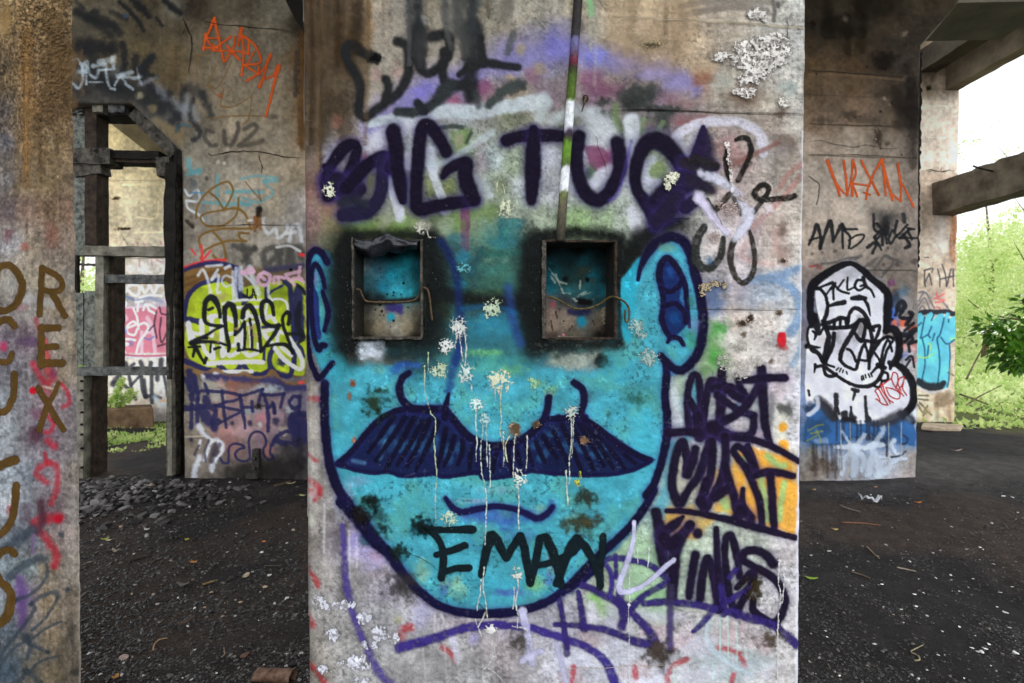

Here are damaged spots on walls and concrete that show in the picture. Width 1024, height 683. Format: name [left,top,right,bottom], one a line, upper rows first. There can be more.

crack [182,18,287,74]
peeling [712,6,792,99]